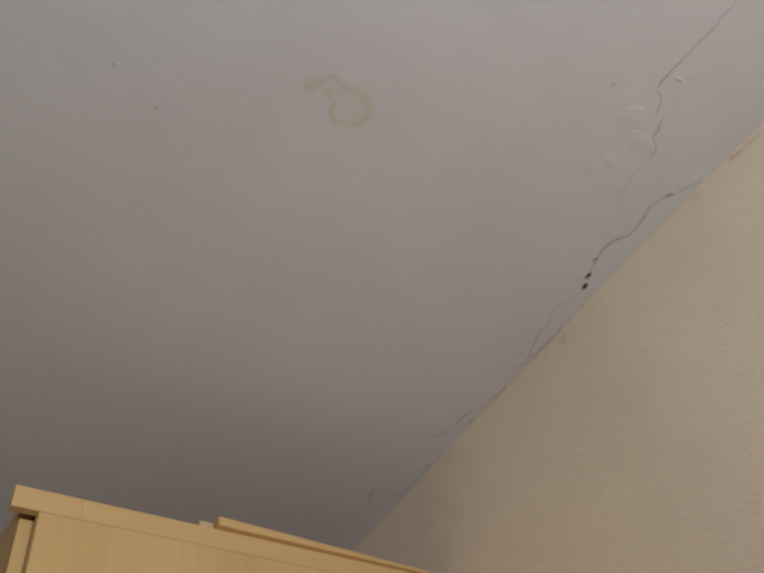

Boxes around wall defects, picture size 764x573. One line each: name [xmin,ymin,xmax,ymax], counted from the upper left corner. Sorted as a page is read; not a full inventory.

crack [614,0,738,208]
crack [431,177,703,438]